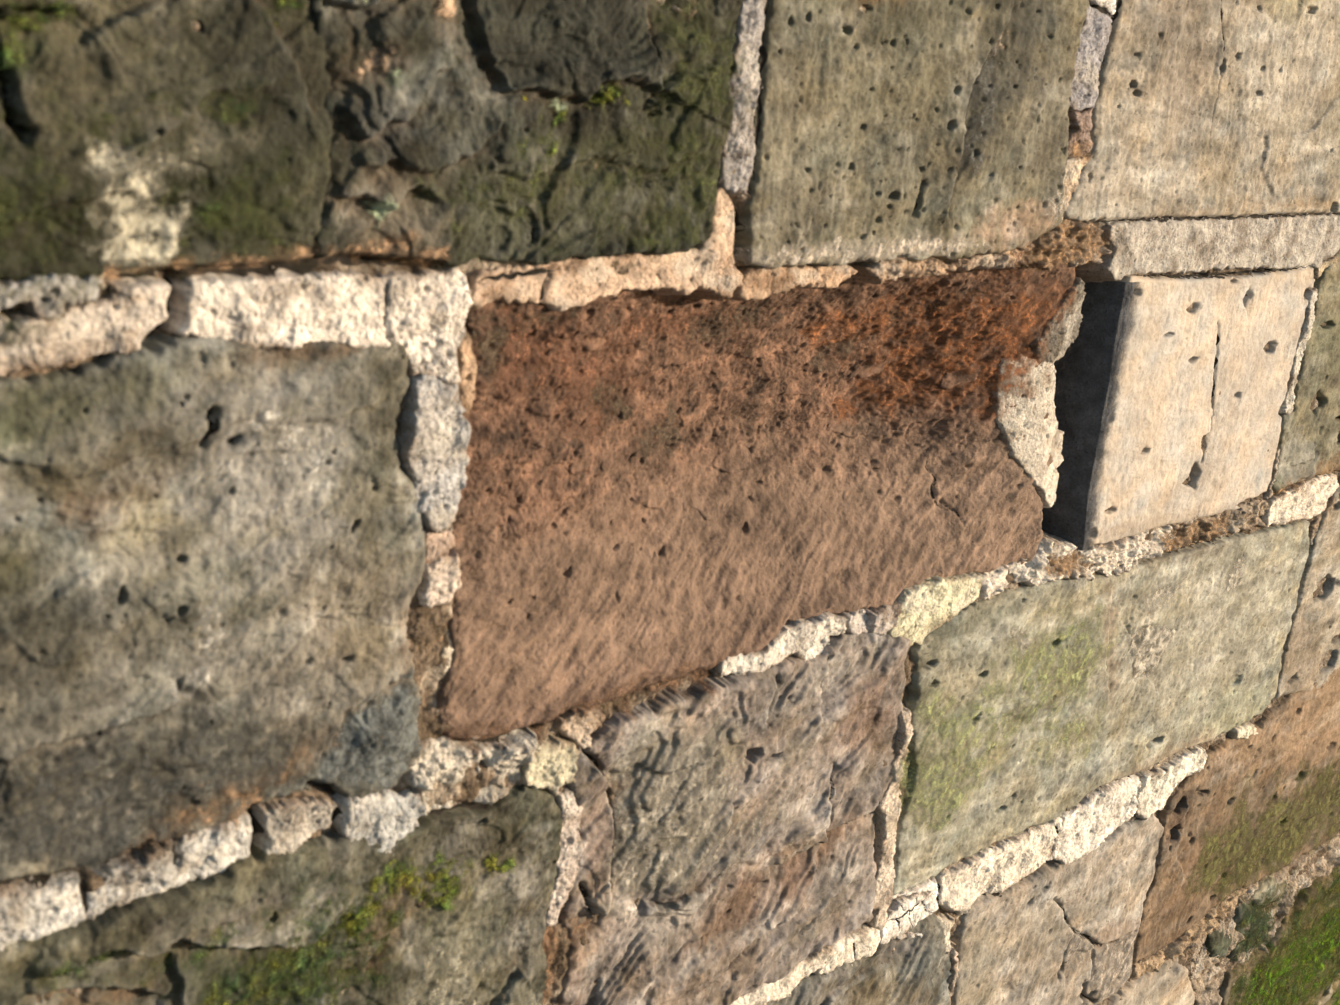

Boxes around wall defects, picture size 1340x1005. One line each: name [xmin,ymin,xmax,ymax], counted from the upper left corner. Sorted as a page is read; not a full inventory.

crack [0,4,46,17]
crack [0,69,26,135]
spalling [440,261,1075,796]
spalling [1130,579,1187,678]
crack [1054,900,1120,947]